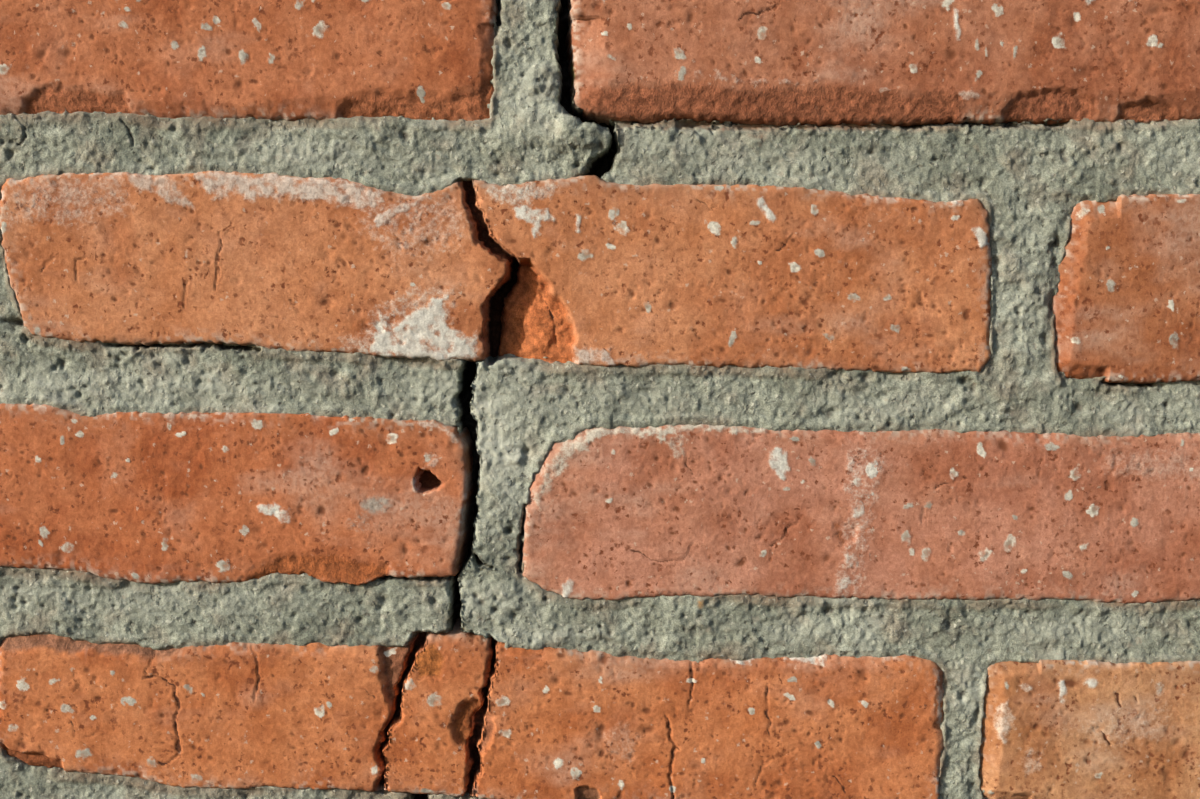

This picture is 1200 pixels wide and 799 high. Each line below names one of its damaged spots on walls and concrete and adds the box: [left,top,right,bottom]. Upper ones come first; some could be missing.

crack [494,0,503,28]
crack [554,0,676,178]
crack [711,121,742,130]
crack [877,119,1072,132]
crack [353,180,557,799]